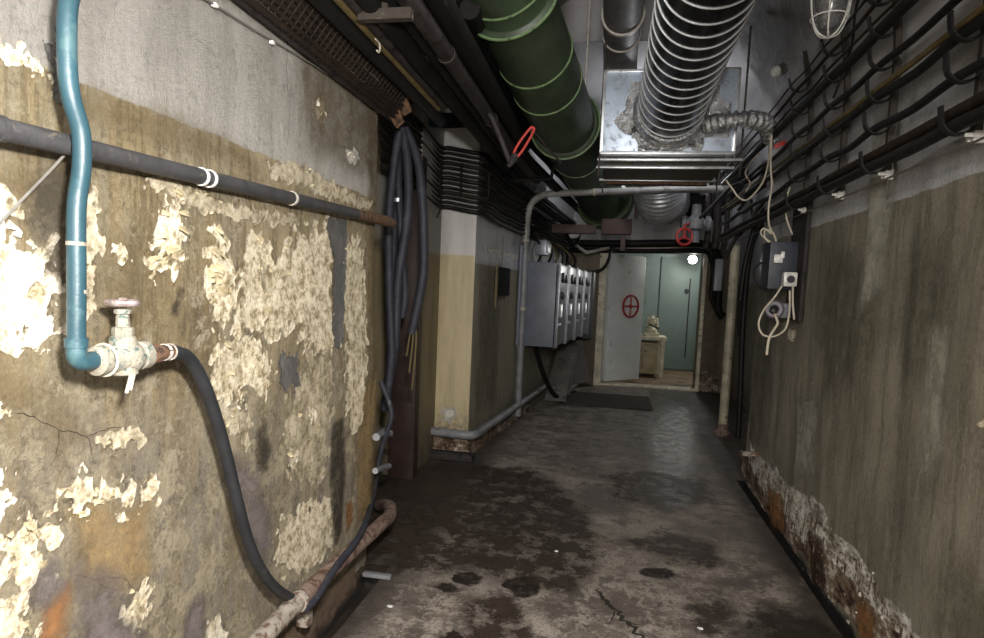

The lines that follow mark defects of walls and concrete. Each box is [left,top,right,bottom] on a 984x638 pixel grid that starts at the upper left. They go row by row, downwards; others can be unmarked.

peeling [0,26,62,103]
flaking render [345,146,360,166]
peeling [0,182,66,358]
peeling [86,156,373,589]
damp [305,65,596,638]
crack [17,413,121,466]
peeling [0,463,162,638]
corrosion [808,532,827,590]
crack [564,569,646,638]